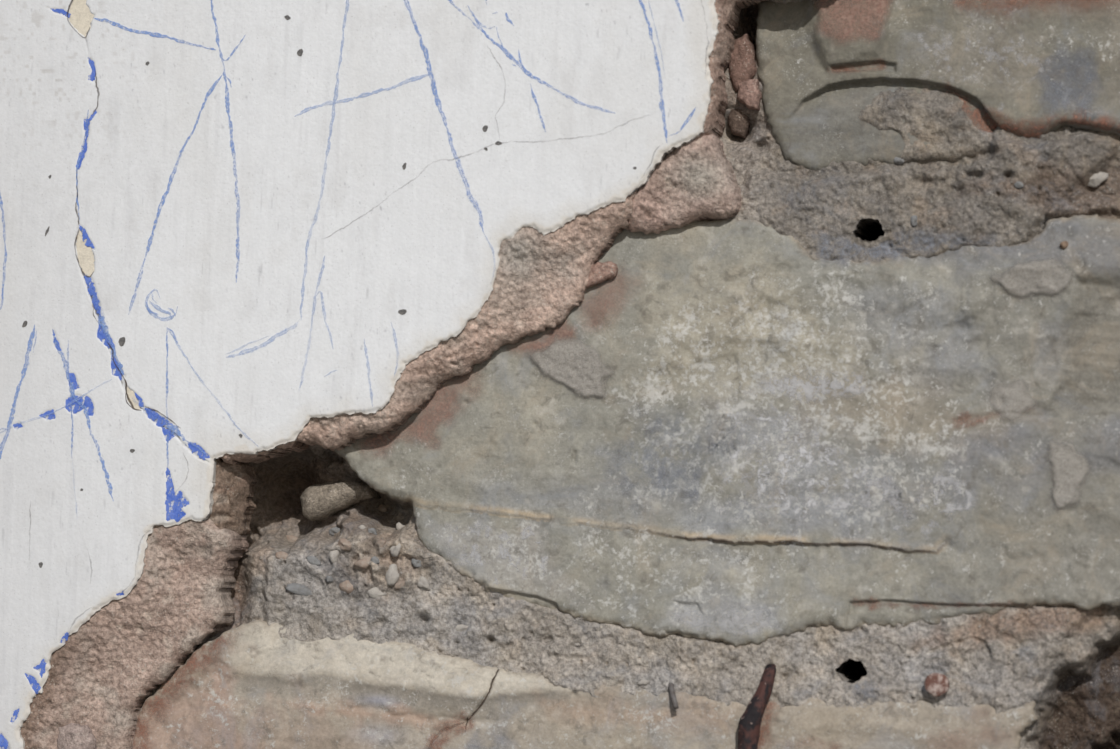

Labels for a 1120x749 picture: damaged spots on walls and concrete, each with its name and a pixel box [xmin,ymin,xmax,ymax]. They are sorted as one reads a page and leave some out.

crack [52,0,210,460]
spalling [695,0,768,140]
spalling [10,191,637,749]
crack [465,670,499,732]